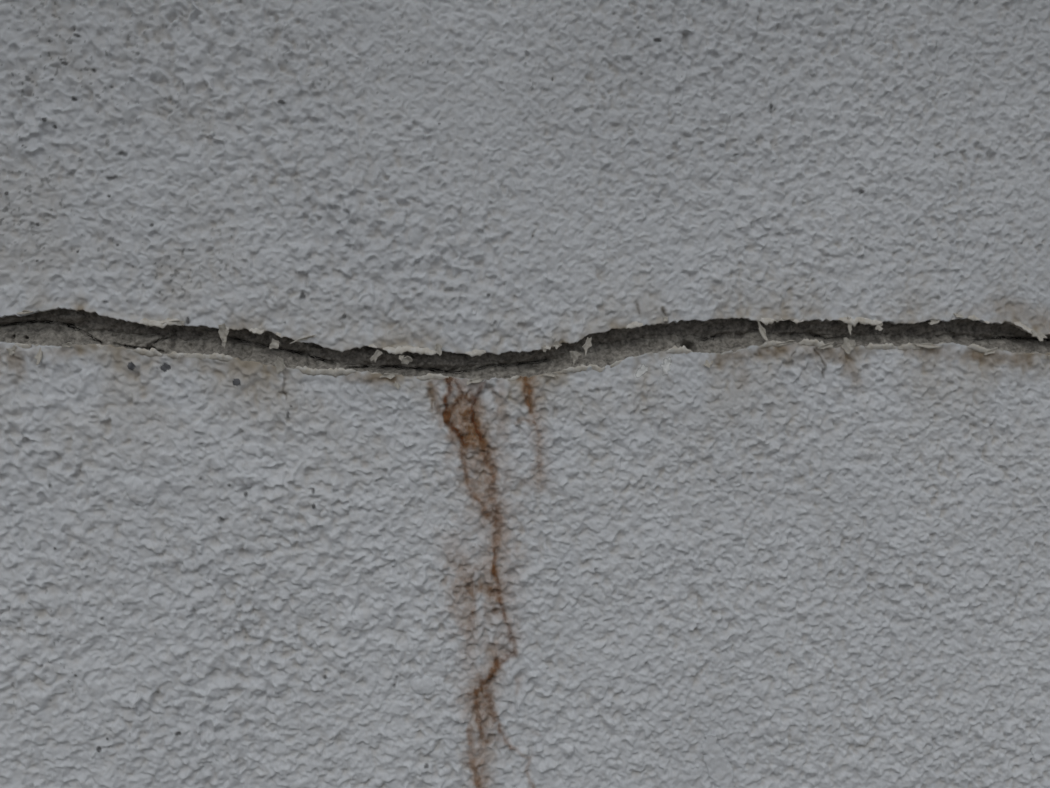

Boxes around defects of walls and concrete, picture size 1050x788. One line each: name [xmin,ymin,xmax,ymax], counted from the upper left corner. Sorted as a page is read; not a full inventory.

crack [0,308,1050,390]
corrosion [442,378,495,485]
corrosion [474,658,499,705]